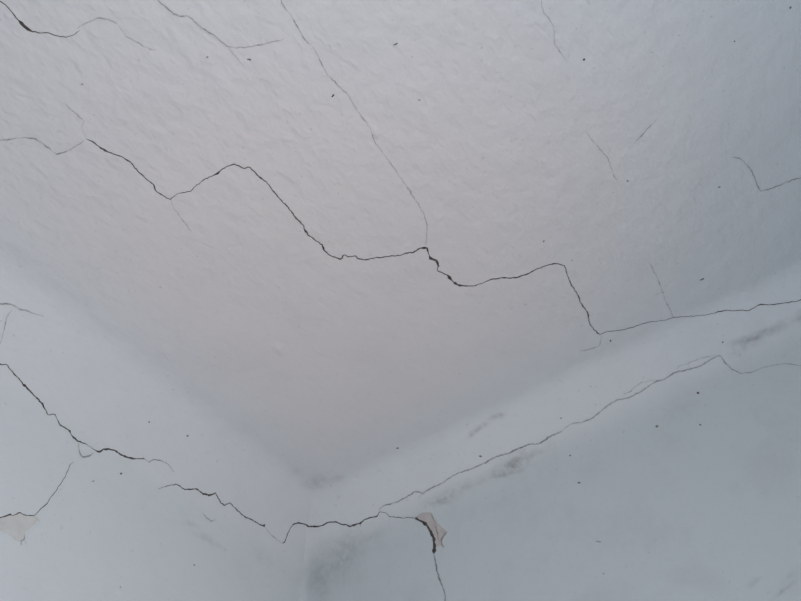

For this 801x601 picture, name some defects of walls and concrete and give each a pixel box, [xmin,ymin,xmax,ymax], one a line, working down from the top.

crack [0,1,78,38]
crack [87,139,801,335]
crack [0,364,265,527]
crack [283,504,413,543]
peeling [413,510,450,554]